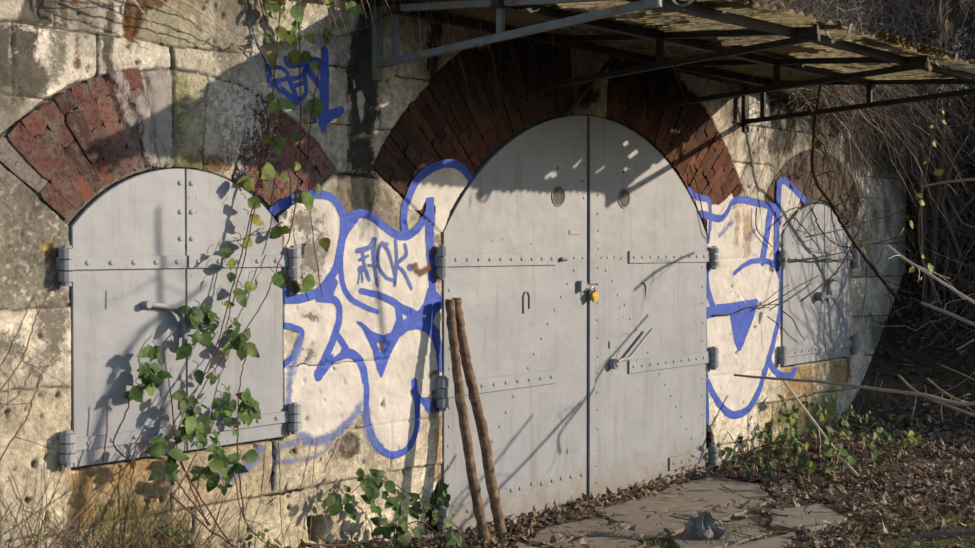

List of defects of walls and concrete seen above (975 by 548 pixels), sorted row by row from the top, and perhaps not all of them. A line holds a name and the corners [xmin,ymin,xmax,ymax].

water stain [344,3,382,212]
water stain [413,21,444,101]